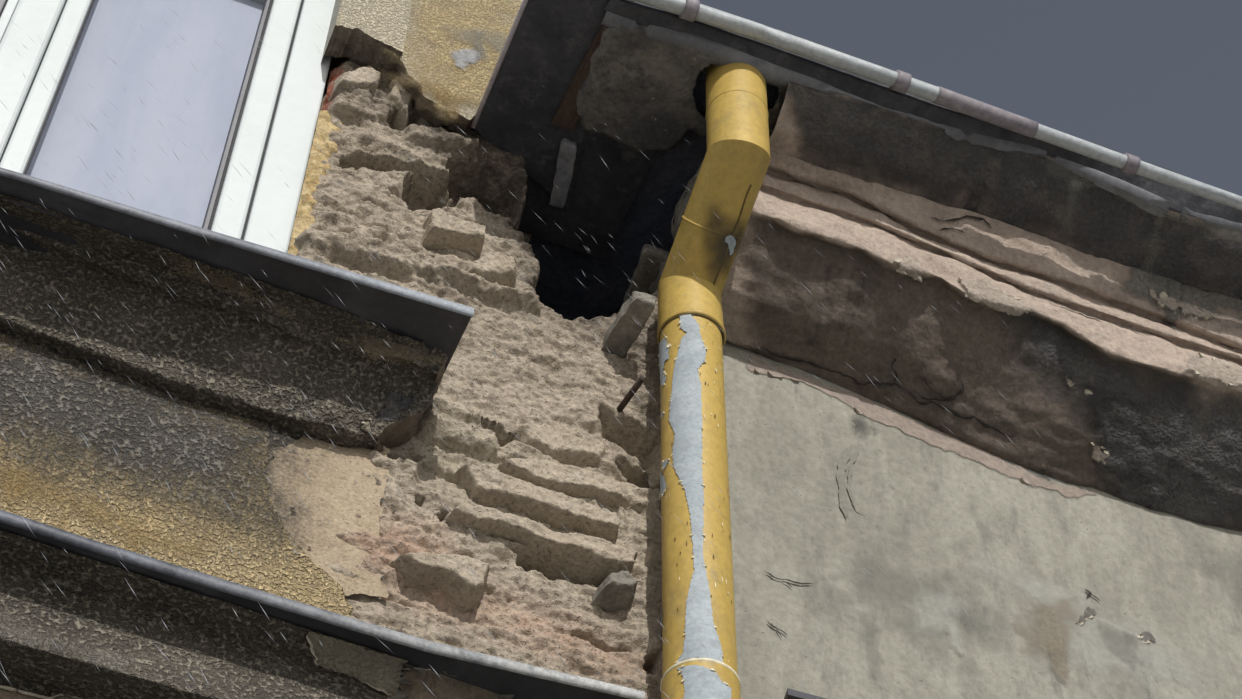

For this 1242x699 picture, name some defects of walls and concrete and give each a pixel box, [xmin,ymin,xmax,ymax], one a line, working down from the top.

peeling [725,235,736,255]
peeling [893,253,922,282]
peeling [958,274,1033,316]
peeling [1124,267,1242,328]
flaking render [261,25,732,699]
crack [744,345,1029,439]
peeling [747,356,1097,498]